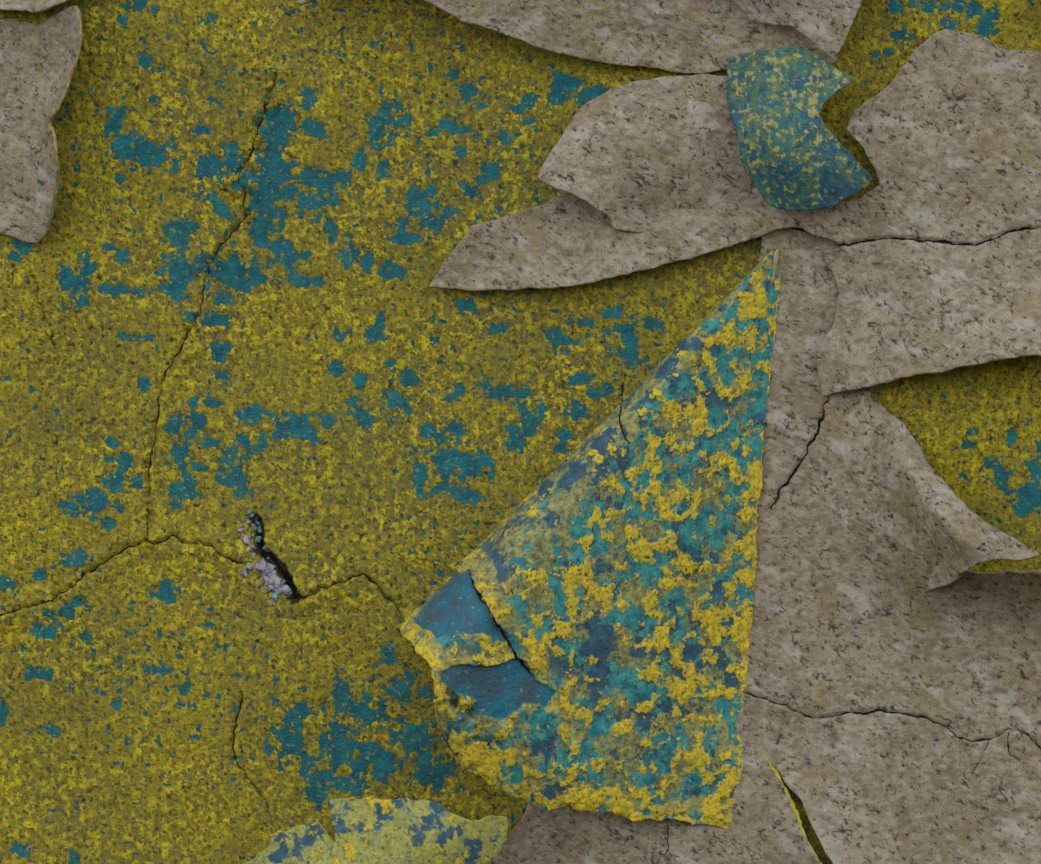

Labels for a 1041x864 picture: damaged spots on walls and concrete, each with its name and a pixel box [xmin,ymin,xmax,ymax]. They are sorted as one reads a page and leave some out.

peeling [0,0,83,262]
crack [835,227,1036,246]
crack [0,78,276,616]
peeling [411,0,1041,864]
crack [770,399,829,509]
crack [302,574,404,622]
crack [745,693,1041,771]